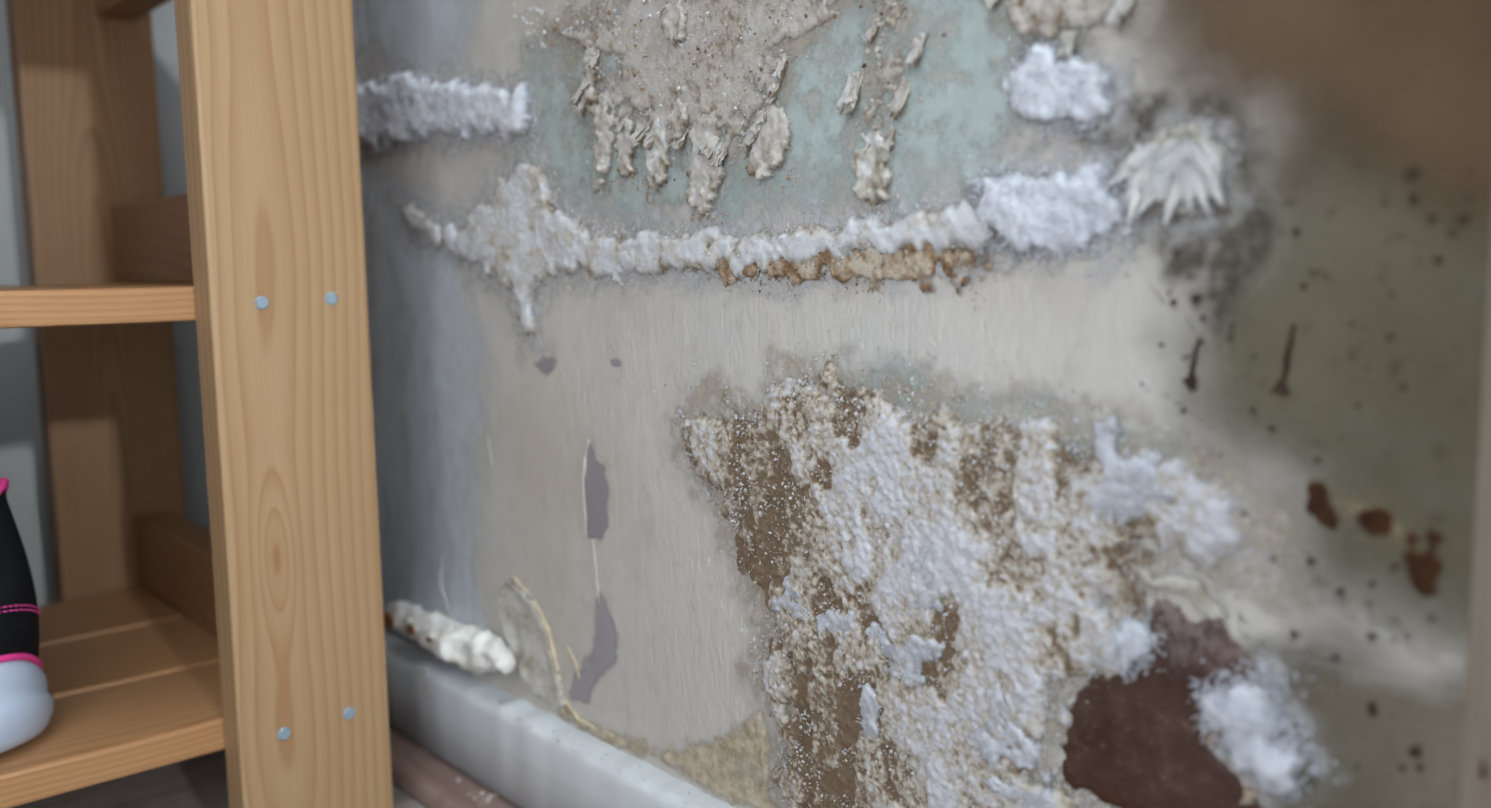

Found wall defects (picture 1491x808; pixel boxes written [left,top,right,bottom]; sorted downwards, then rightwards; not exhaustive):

flaking render [506,0,946,228]
flaking render [980,0,1136,67]
damp [352,0,1491,808]
flaking render [981,568,1265,808]